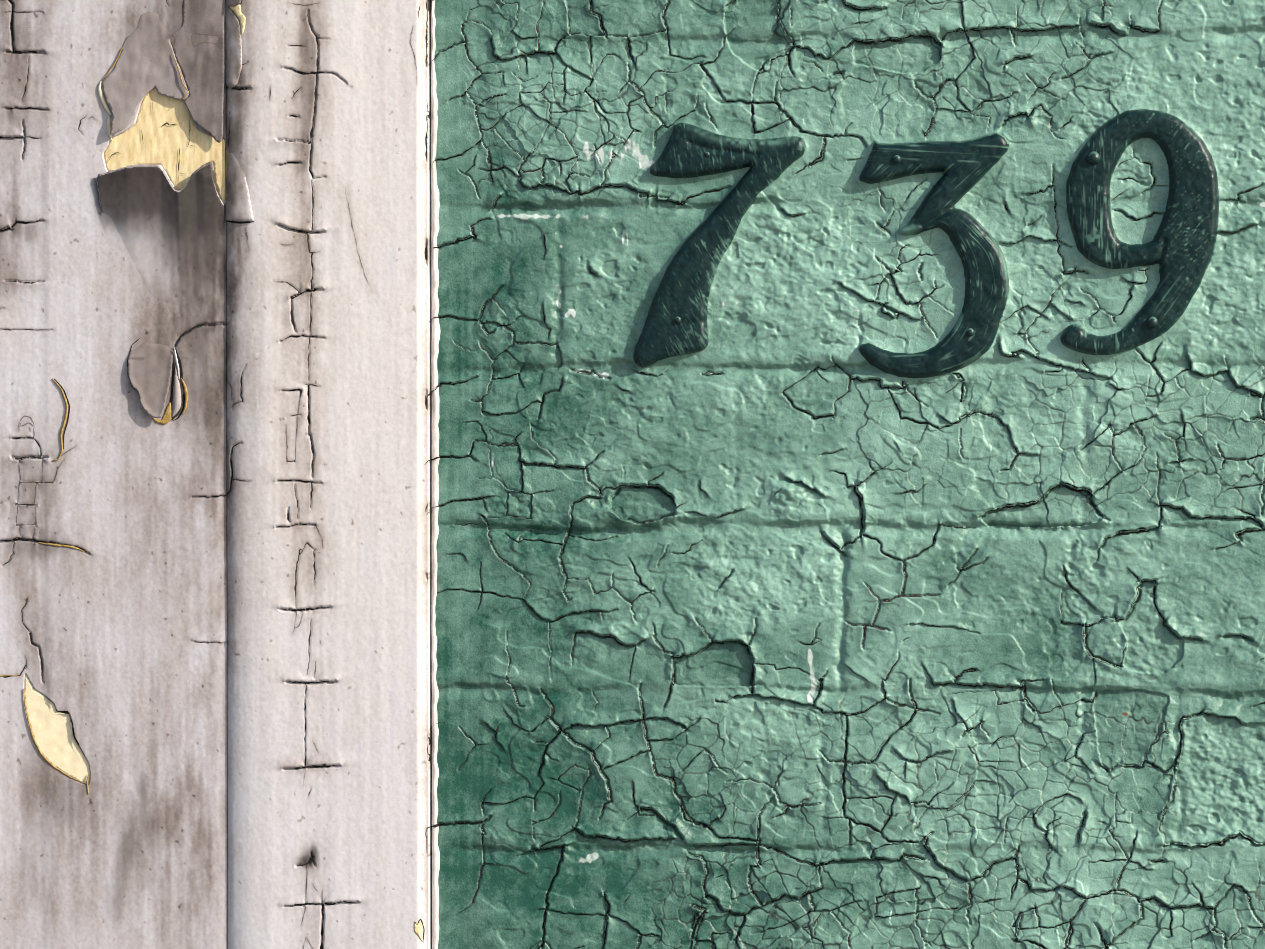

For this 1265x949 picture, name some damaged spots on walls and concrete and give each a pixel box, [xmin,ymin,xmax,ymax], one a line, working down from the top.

crack [0,220,40,232]
crack [0,0,46,157]
peeling [97,0,254,307]
crack [410,0,1168,263]
peeling [127,338,188,425]
crack [226,3,367,794]
crack [1,416,86,565]
spalling [610,486,675,523]
crack [425,167,1265,949]
peeling [0,675,90,794]
spalling [672,641,754,687]
crack [292,854,355,949]